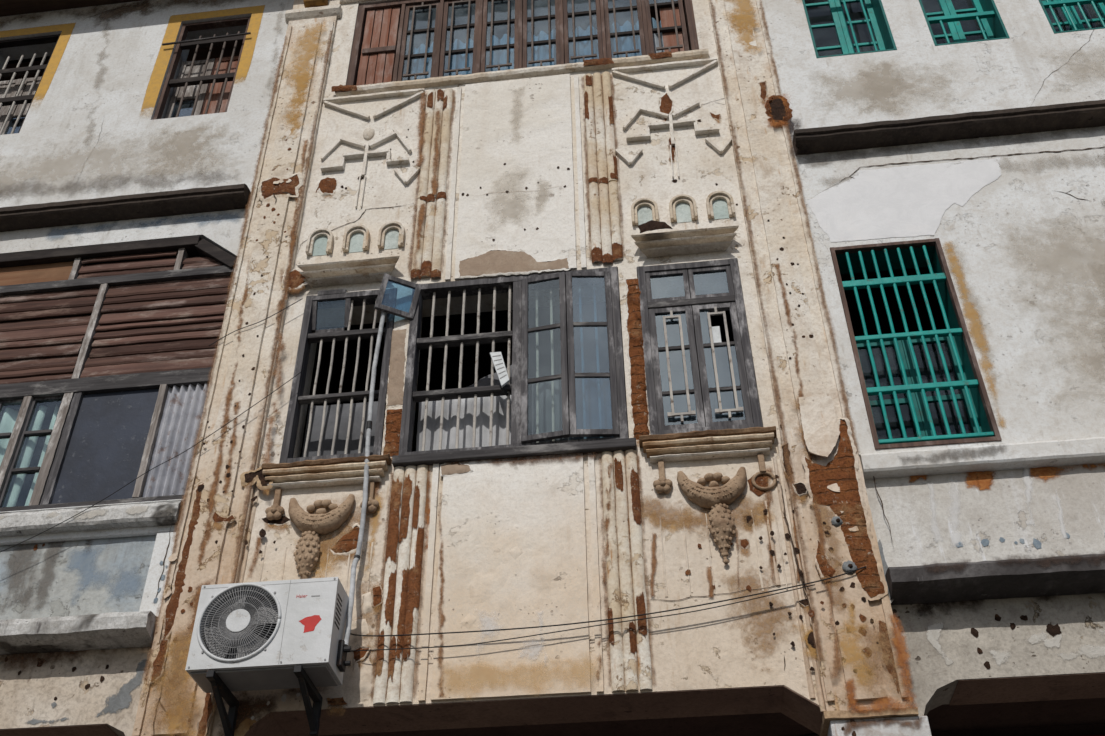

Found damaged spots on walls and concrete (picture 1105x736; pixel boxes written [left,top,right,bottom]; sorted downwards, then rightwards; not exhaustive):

spalling [759,81,793,122]
spalling [258,168,347,233]
flaking render [807,157,1001,242]
peeling [458,239,571,278]
spalling [625,278,650,443]
spalling [614,458,642,525]
water stain [9,539,140,608]
spalling [96,482,236,717]
spalling [352,473,424,682]
spalling [629,592,647,654]
spalling [731,509,800,569]
spalling [747,396,900,696]